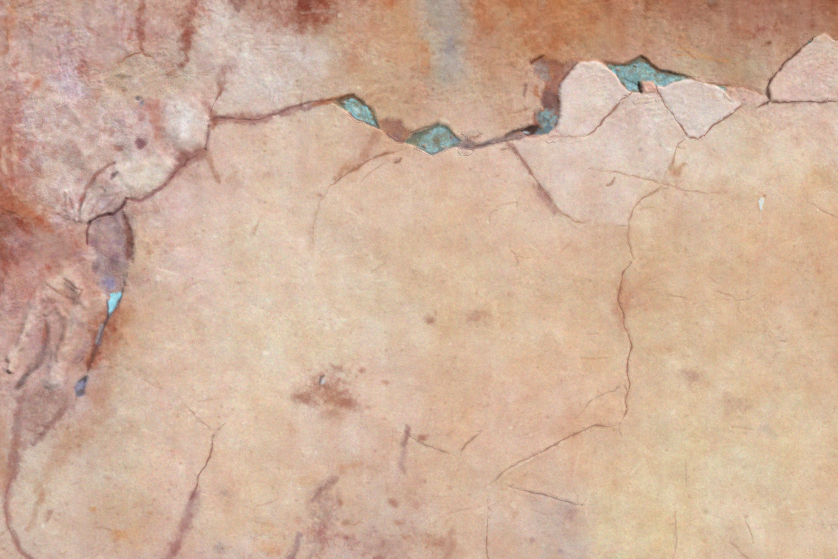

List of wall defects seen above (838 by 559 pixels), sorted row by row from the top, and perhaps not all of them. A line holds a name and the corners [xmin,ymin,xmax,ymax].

rust [174,0,197,65]
rust [232,0,366,34]
rust [471,0,838,62]
spalling [11,51,193,347]
crack [457,129,593,231]
flaking render [331,33,838,230]
spalling [0,210,41,308]
crack [485,32,838,559]
spalling [72,374,90,399]
crack [0,454,35,559]